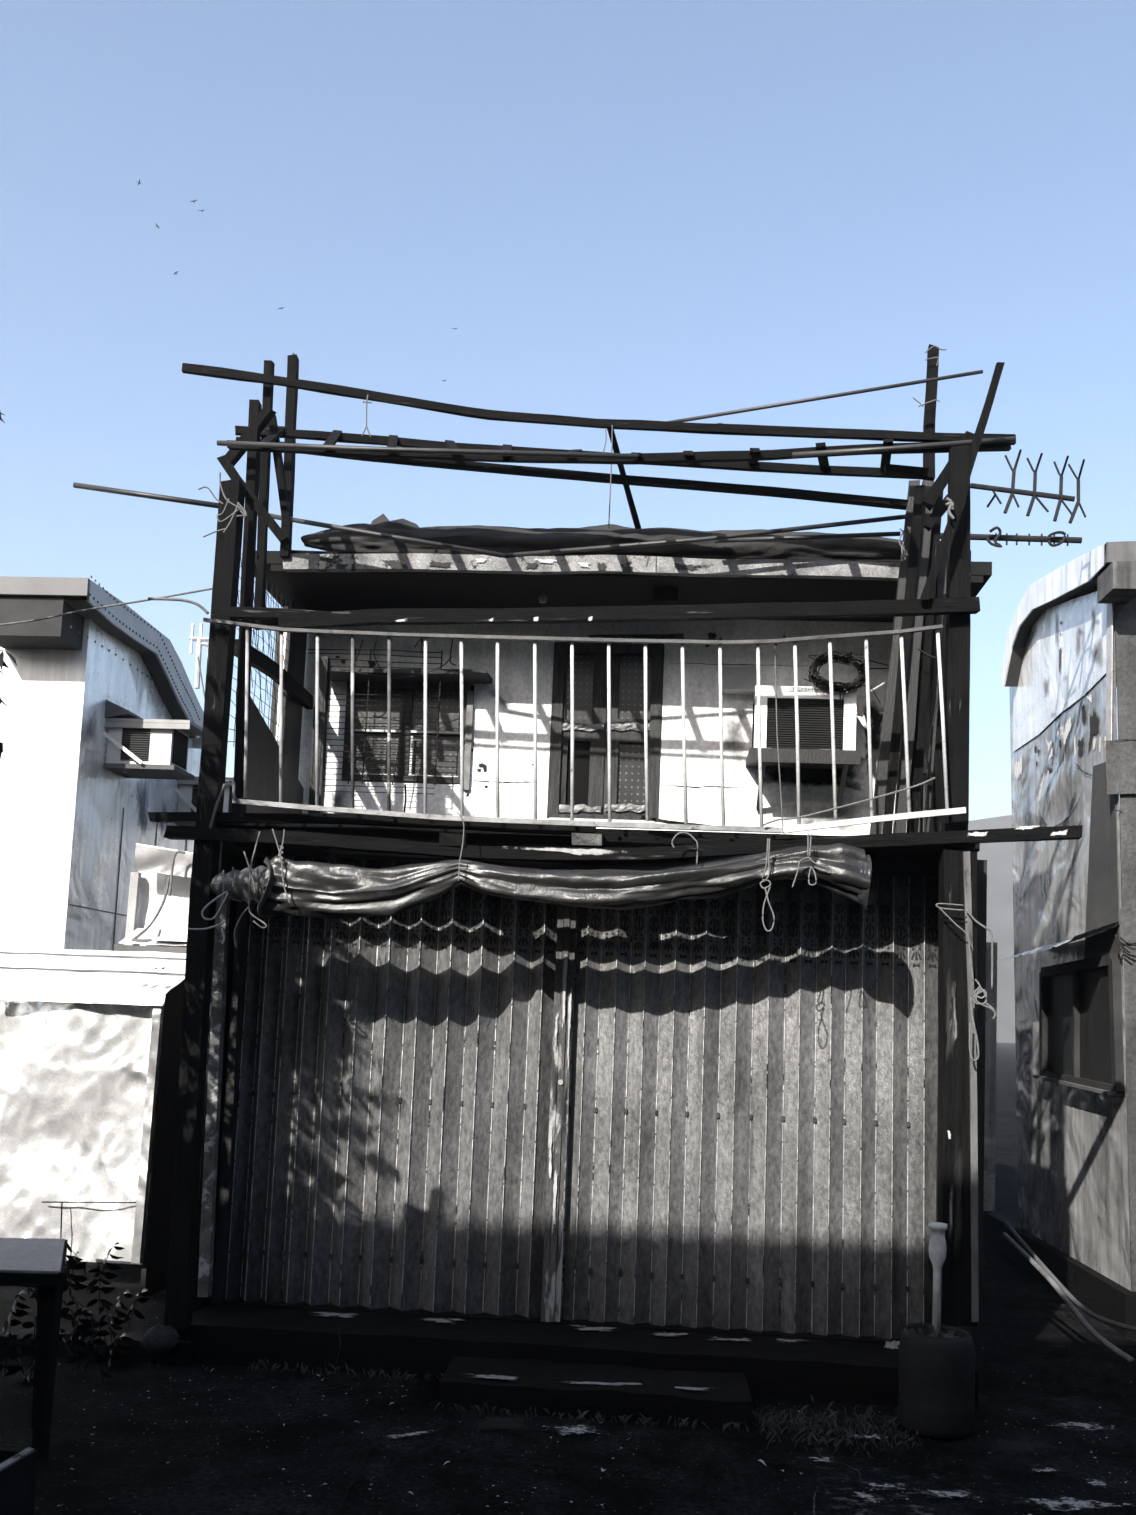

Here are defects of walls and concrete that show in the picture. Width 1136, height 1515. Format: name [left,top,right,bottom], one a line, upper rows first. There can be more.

leakage [726,715,743,750]
peeling [555,955,572,1071]
peeling [549,1128,558,1233]